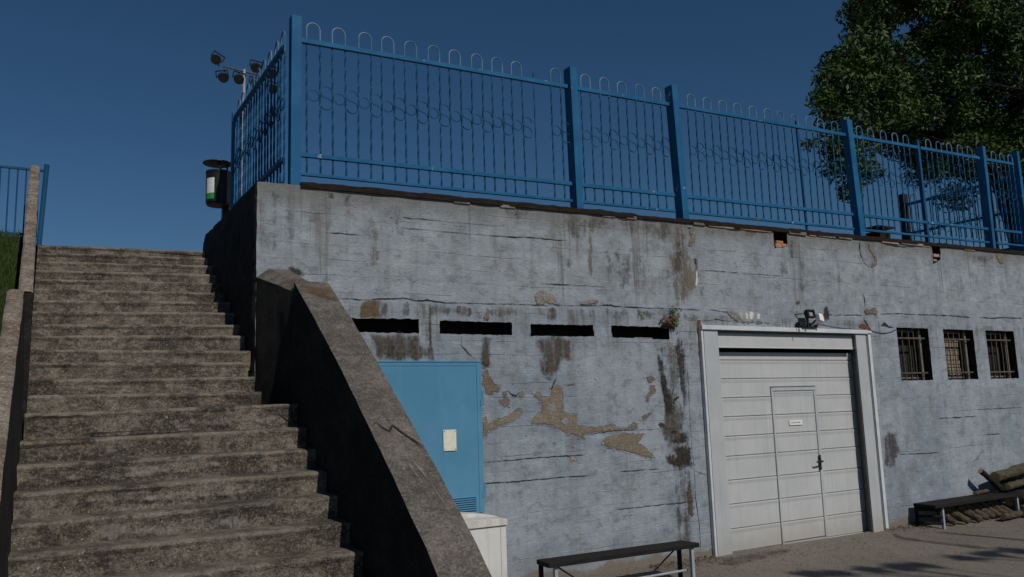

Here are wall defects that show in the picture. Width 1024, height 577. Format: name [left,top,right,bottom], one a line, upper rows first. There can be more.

spalling [687,222,852,248]
water stain [373,305,471,361]
water stain [539,337,570,375]
crack [373,416,432,463]
peeling [481,368,657,463]
water stain [658,339,692,468]
water stain [678,481,694,541]